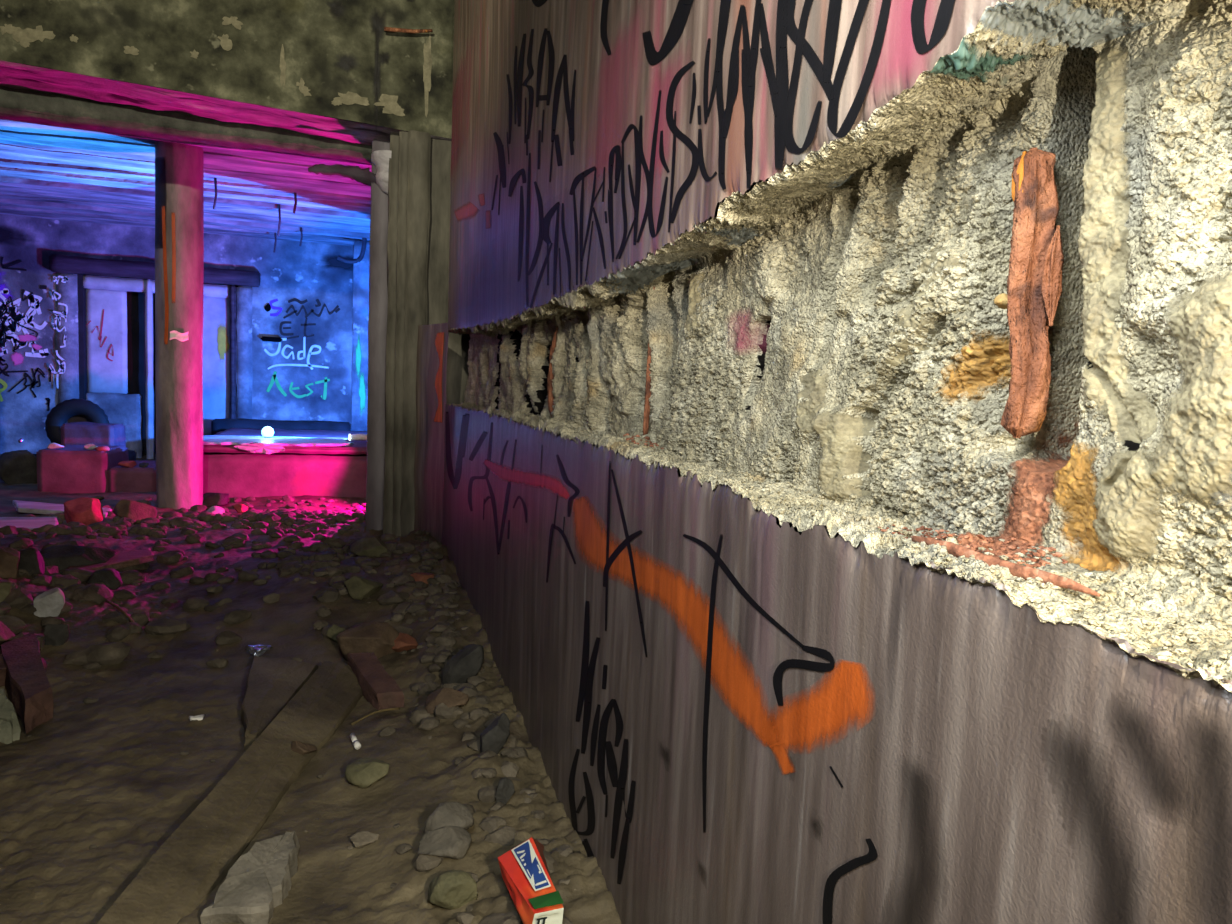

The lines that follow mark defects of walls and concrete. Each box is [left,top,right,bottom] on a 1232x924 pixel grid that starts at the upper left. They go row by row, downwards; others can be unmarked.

spalling [446,0,1232,693]
rust [941,147,1064,438]
rust [911,436,1120,597]